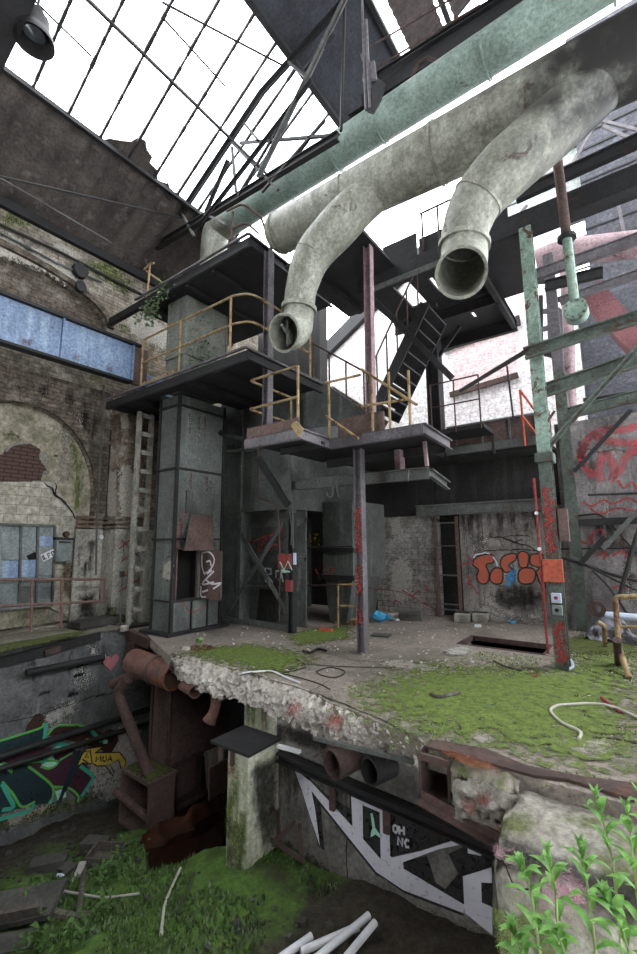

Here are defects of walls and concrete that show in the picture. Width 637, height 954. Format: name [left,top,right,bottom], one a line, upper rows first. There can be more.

spalling [0,426,75,482]
crack [44,482,76,519]
spalling [169,646,426,771]
spalling [451,775,525,832]